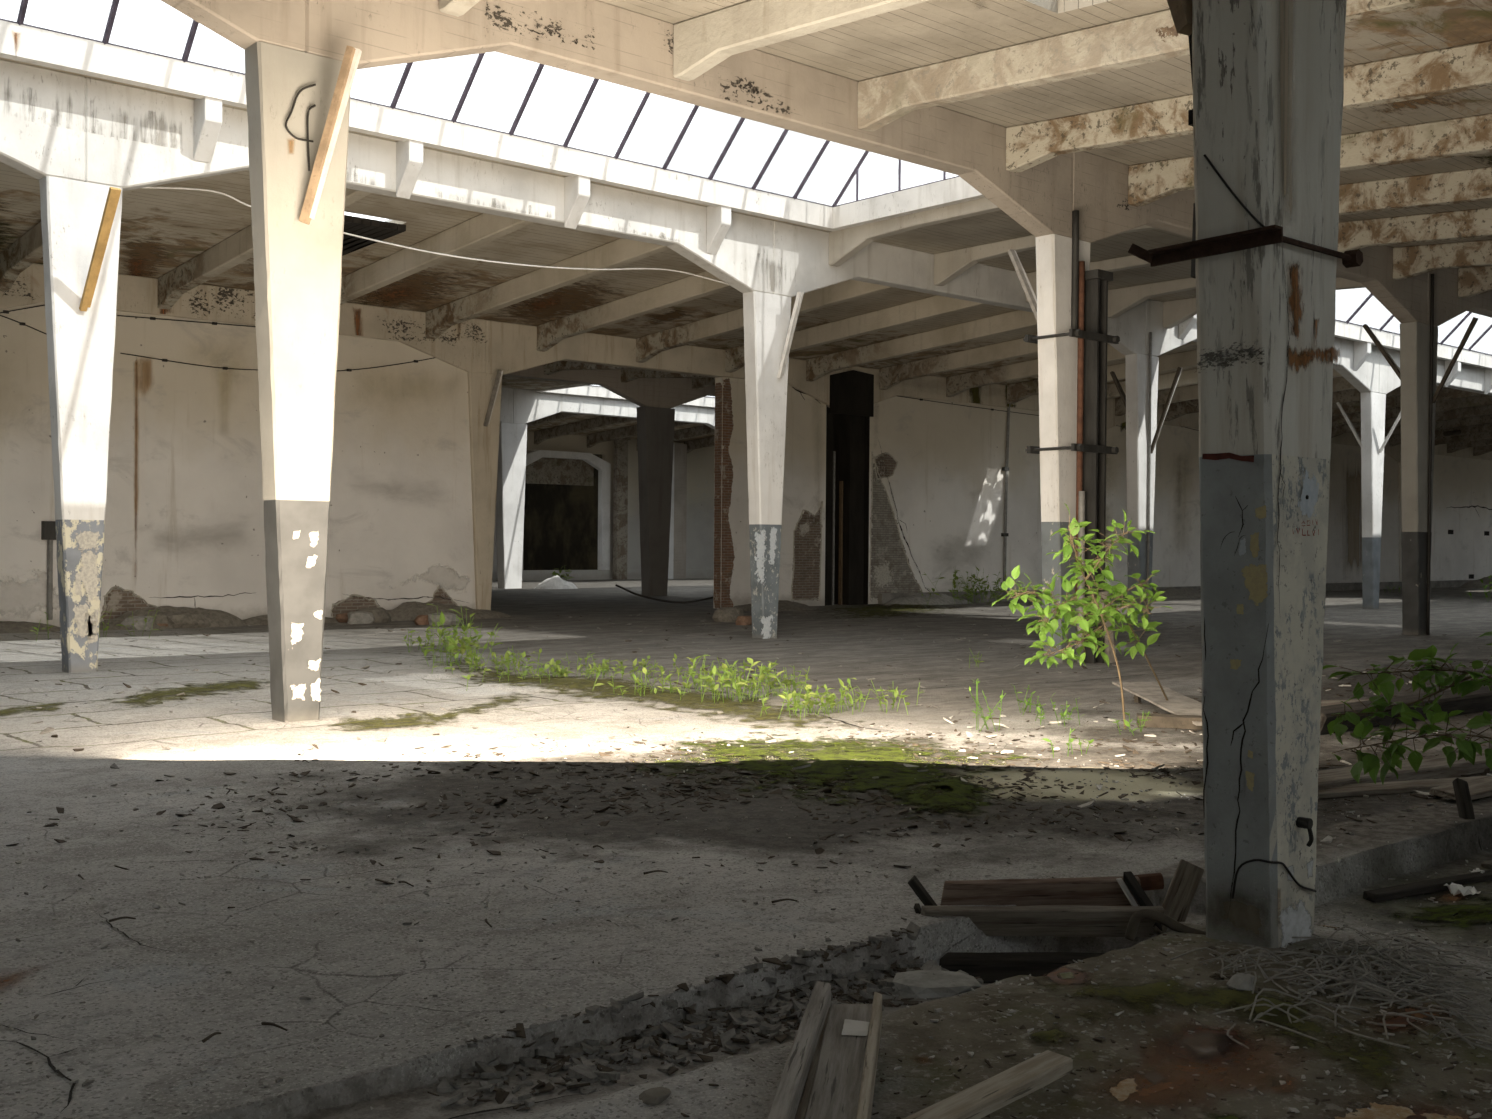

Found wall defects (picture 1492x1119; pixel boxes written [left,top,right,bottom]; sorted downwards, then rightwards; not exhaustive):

water stain [1385,95,1454,113]
rust [1288,263,1340,373]
peeling [293,530,319,568]
peeling [406,565,469,606]
flaking render [713,378,735,608]
peeling [761,615,775,639]
flaking render [754,501,823,601]
flaking render [869,451,922,602]
crack [925,248,1296,919]
peeling [291,658,322,702]